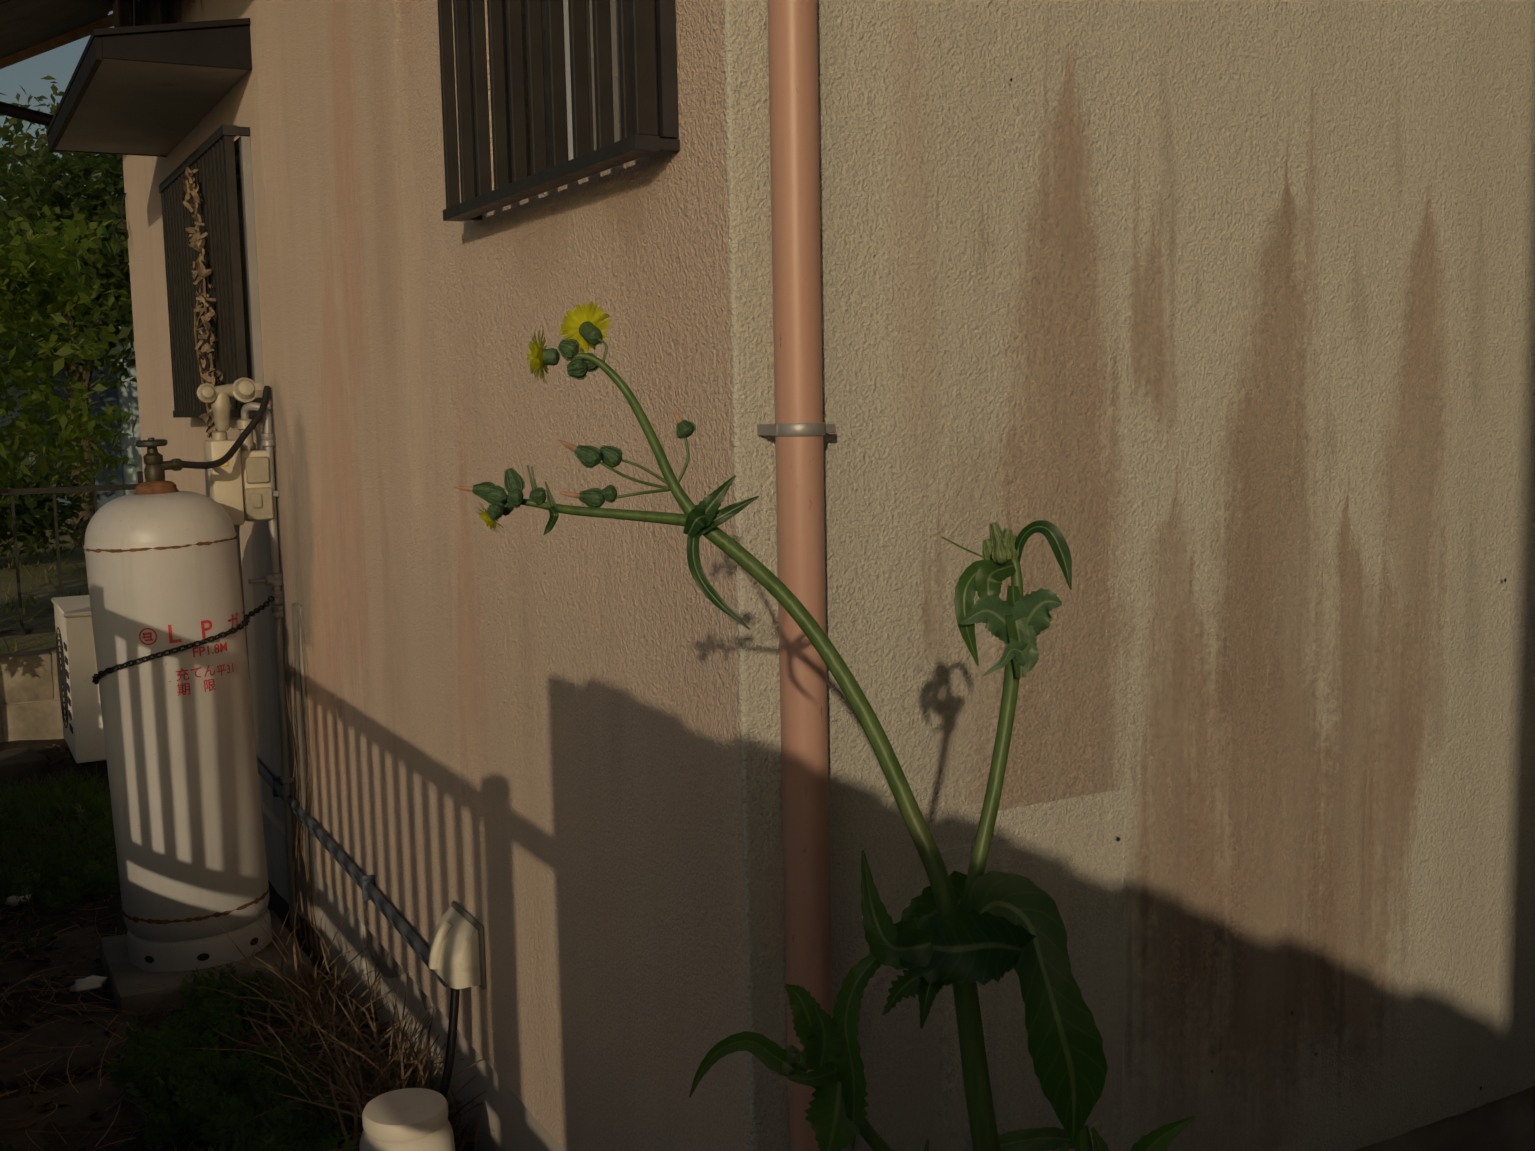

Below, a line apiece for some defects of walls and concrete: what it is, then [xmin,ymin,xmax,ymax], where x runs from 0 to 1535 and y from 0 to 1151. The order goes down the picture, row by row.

leakage [1007,631,1044,809]
leakage [1010,276,1060,596]
leakage [1197,355,1278,911]
leakage [1312,494,1383,1043]